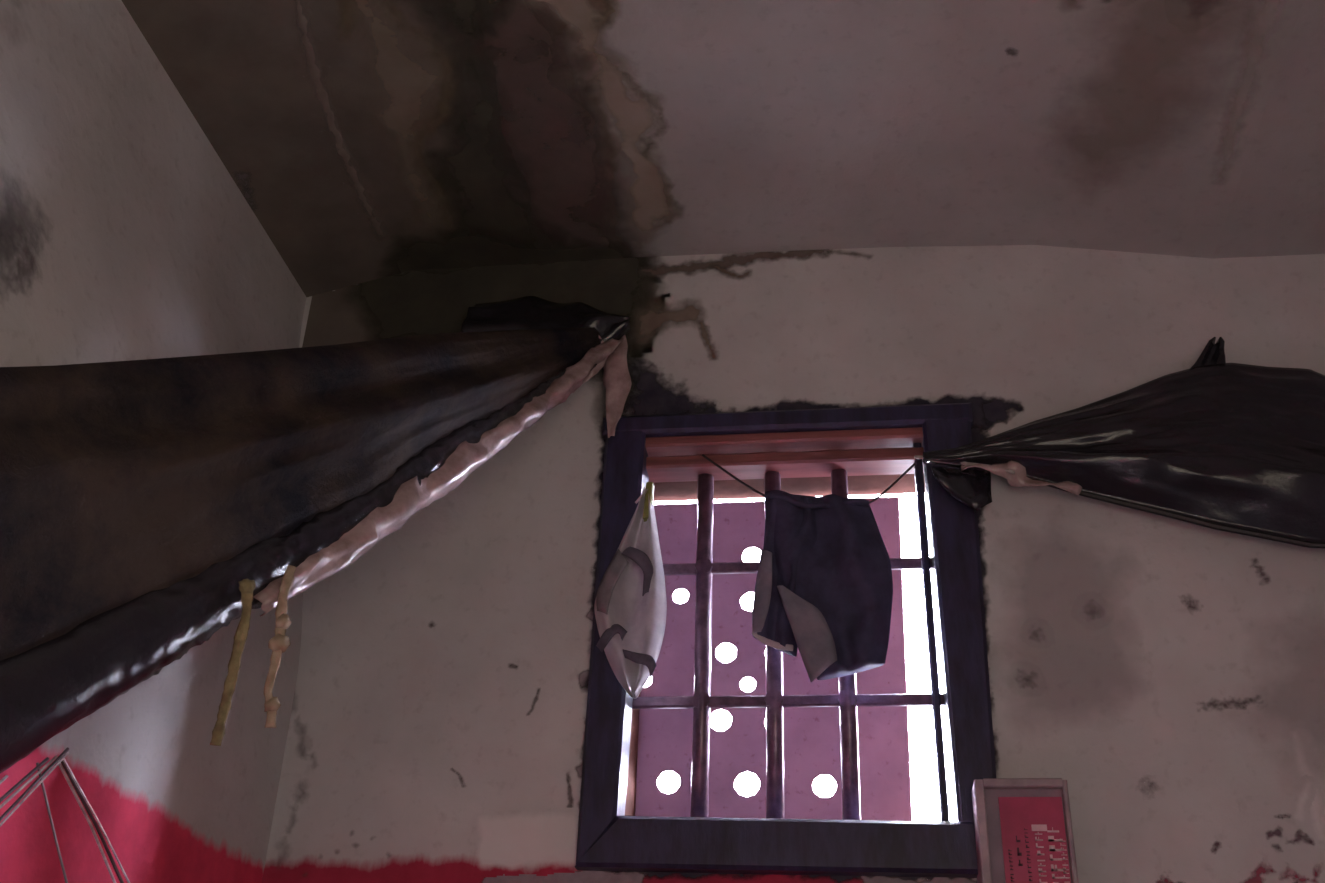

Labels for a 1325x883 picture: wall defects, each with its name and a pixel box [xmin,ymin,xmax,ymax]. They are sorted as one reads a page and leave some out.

crack [640,249,870,278]
peeling [482,871,644,883]